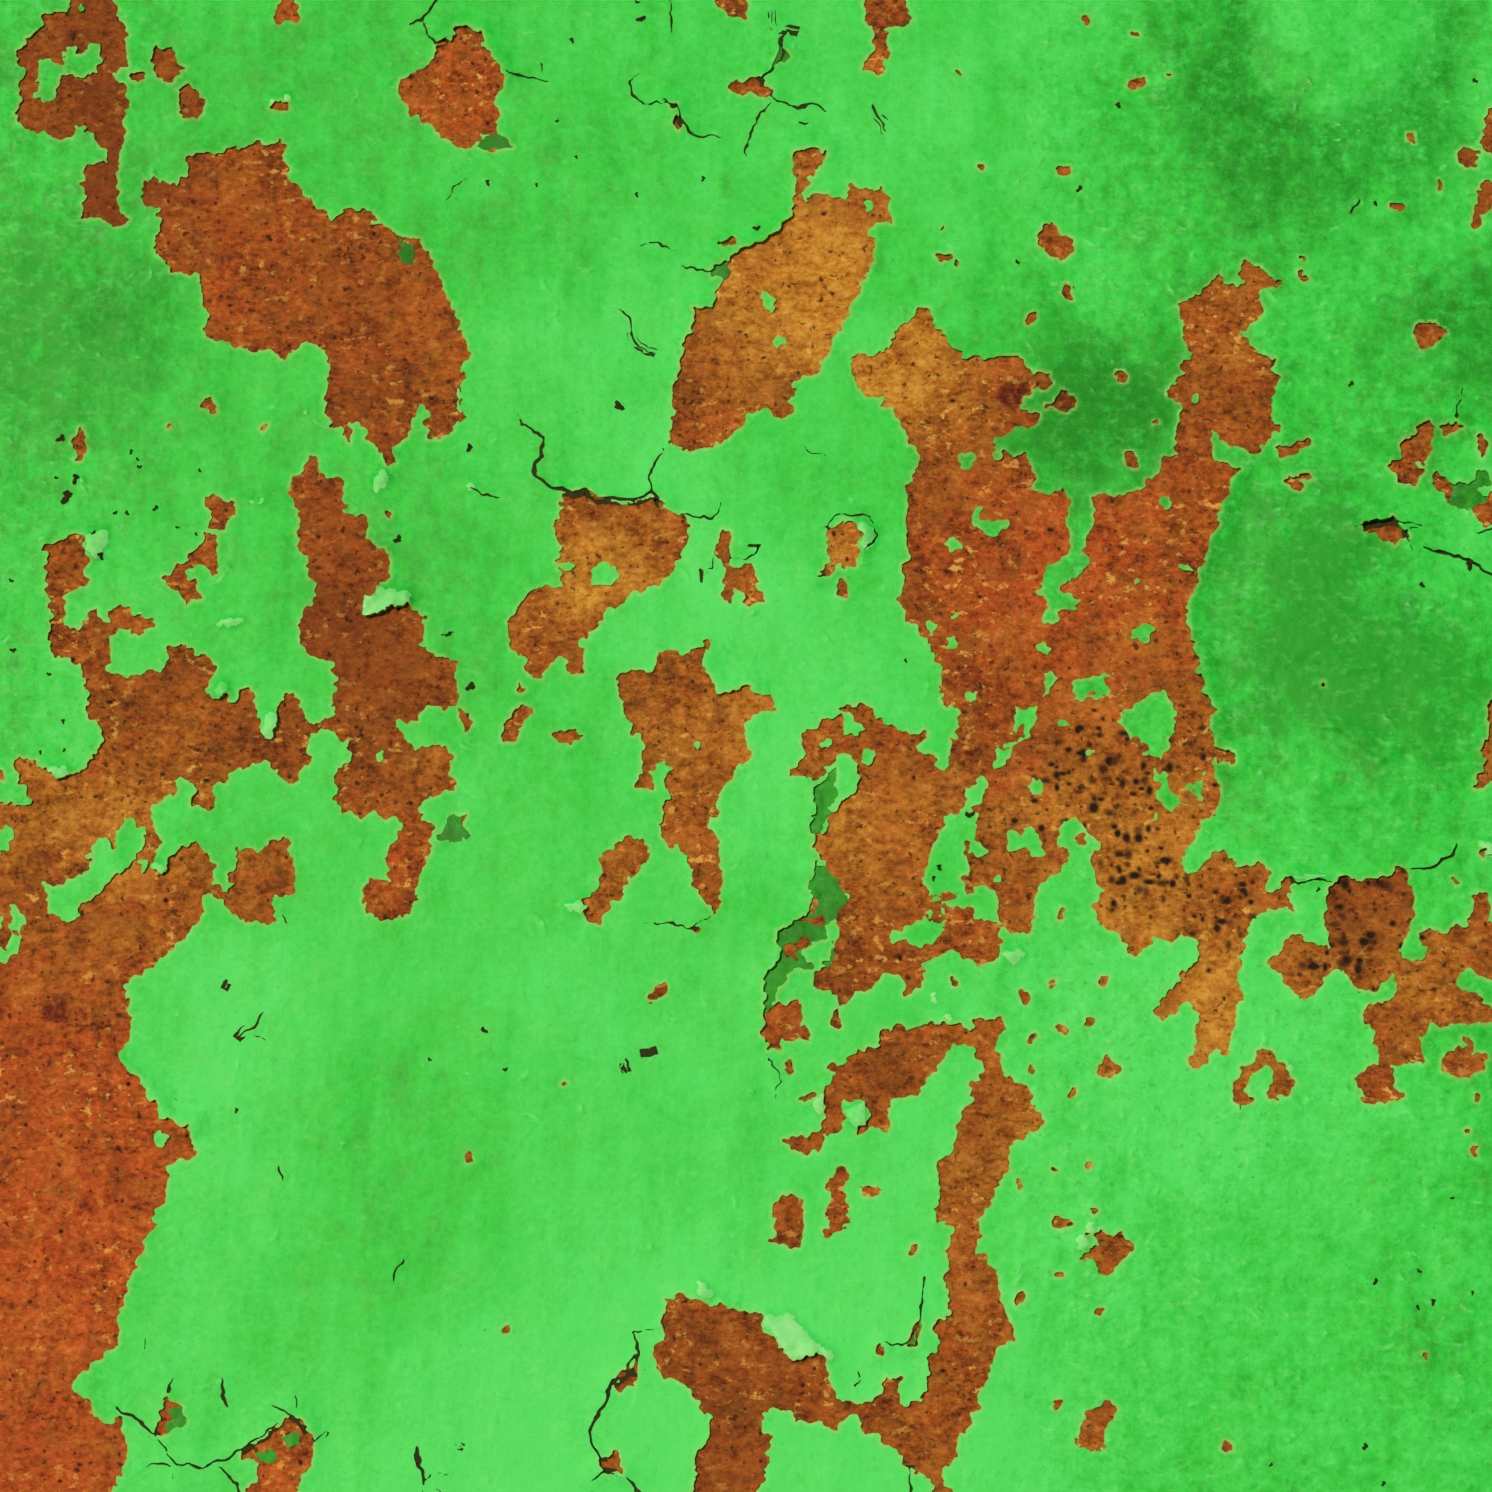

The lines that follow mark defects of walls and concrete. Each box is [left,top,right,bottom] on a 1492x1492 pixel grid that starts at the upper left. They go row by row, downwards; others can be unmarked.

corrosion [16,0,205,227]
corrosion [399,27,513,152]
crack [628,9,826,156]
corrosion [141,139,471,493]
corrosion [668,148,892,452]
crack [518,414,721,520]
crack [699,544,761,583]
crack [1362,517,1492,576]
corrosion [616,256,1492,1492]
corrosion [0,456,473,1492]
crack [114,1395,329,1492]
crack [588,1329,652,1492]